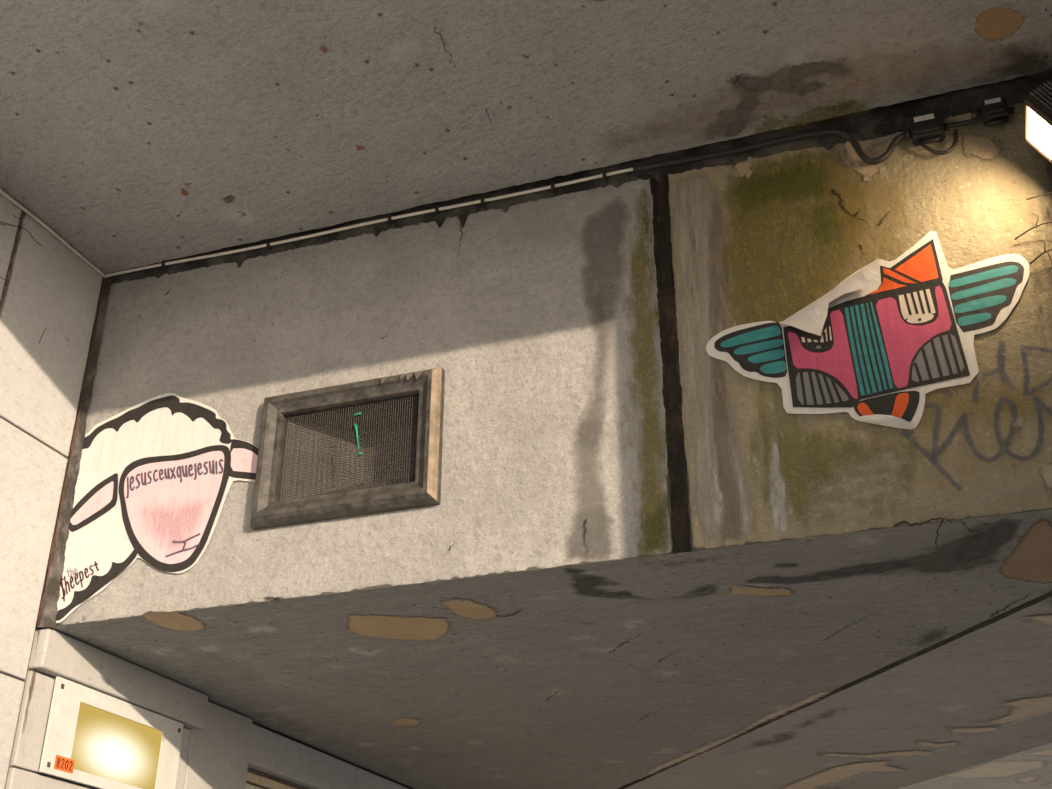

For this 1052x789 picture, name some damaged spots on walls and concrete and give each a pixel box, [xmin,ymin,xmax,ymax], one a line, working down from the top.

peeling [972,5,1025,44]
water stain [694,62,852,136]
water stain [571,203,625,556]
water stain [569,570,633,598]
water stain [747,519,1018,584]
crack [894,517,979,559]
peeling [999,519,1052,585]
peeling [347,599,502,640]
peeling [636,690,832,780]
peeling [781,695,1052,789]